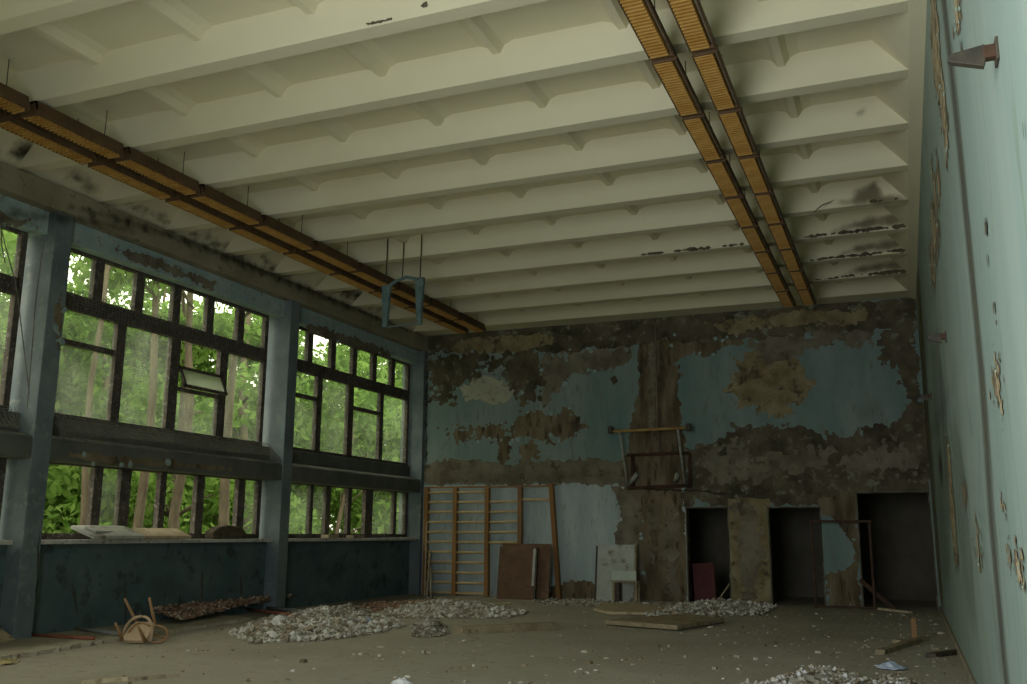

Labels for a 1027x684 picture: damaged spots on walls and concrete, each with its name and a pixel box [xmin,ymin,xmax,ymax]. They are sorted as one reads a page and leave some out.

peeling [952,0,962,51]
peeling [928,0,949,304]
damp [854,184,898,204]
damp [804,216,907,280]
peeling [989,352,1004,415]
spalling [424,307,930,607]
peeling [945,430,985,573]
peeling [1005,534,1025,593]